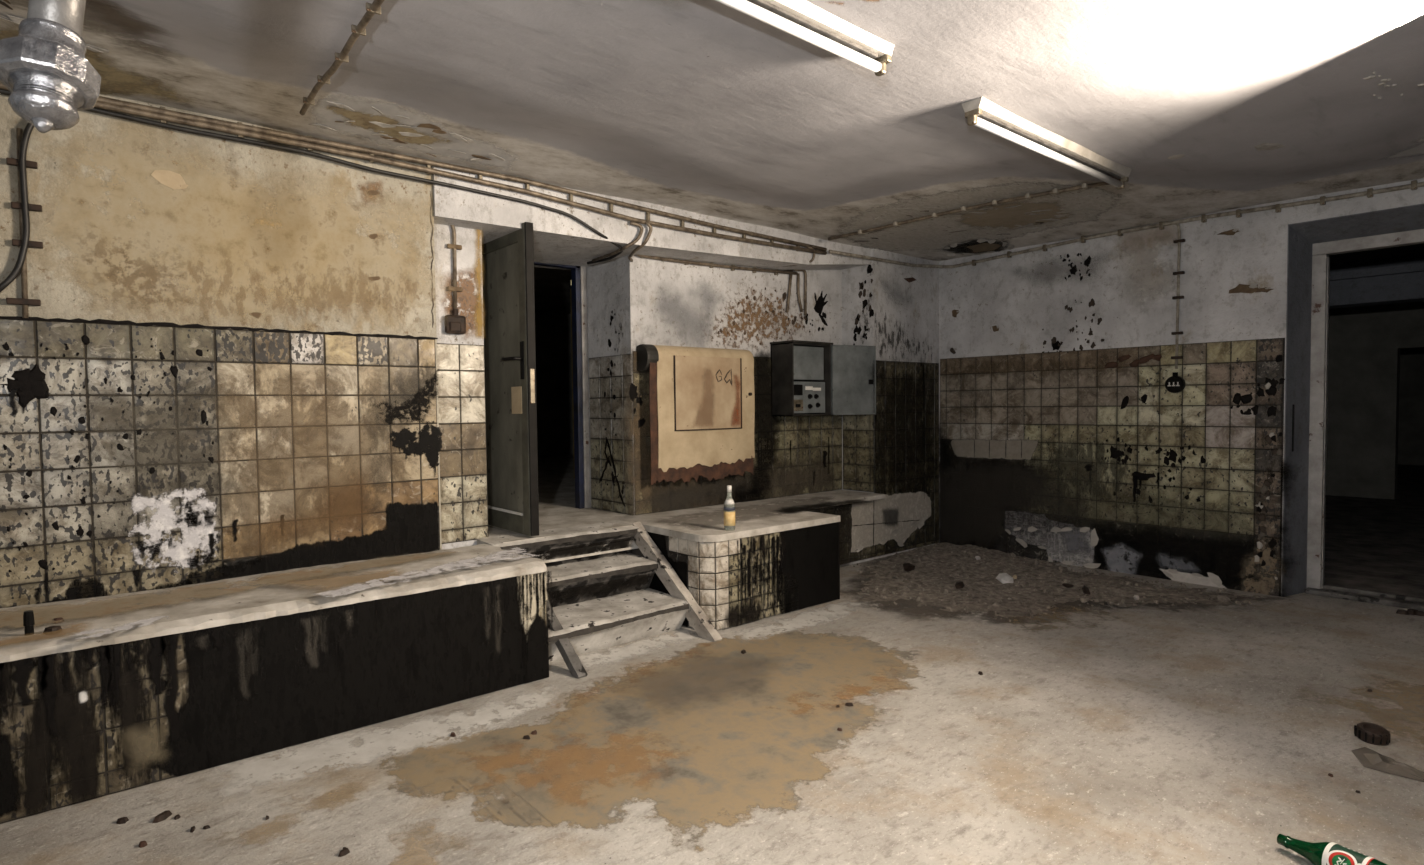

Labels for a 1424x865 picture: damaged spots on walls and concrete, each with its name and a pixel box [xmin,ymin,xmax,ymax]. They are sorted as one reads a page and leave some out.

water stain [48,129,425,318]
water stain [875,316,929,499]
spalling [1004,511,1100,568]
water stain [0,634,181,743]
water stain [210,626,225,648]